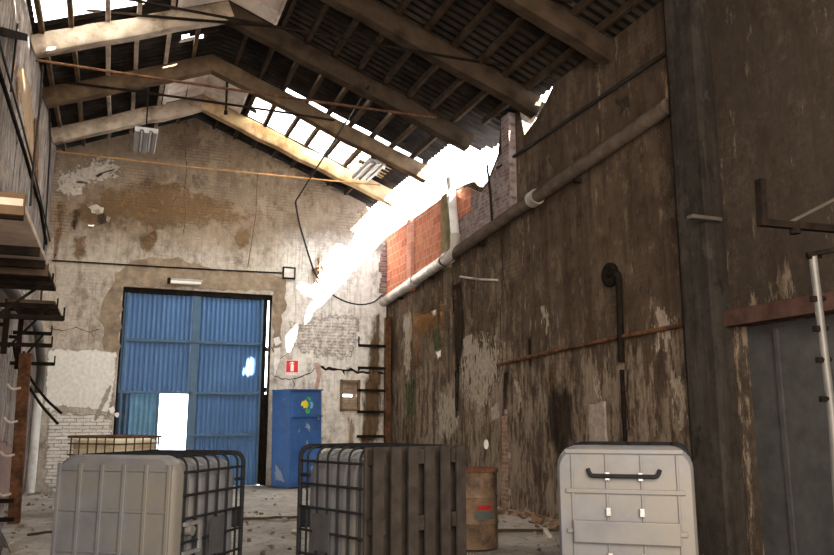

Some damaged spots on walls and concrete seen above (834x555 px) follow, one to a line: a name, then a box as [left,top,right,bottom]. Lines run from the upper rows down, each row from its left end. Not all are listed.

peeling [56,157,121,199]
flaking render [273,308,359,376]
crack [271,347,384,387]
flaking render [44,406,119,492]
water stain [547,386,576,458]